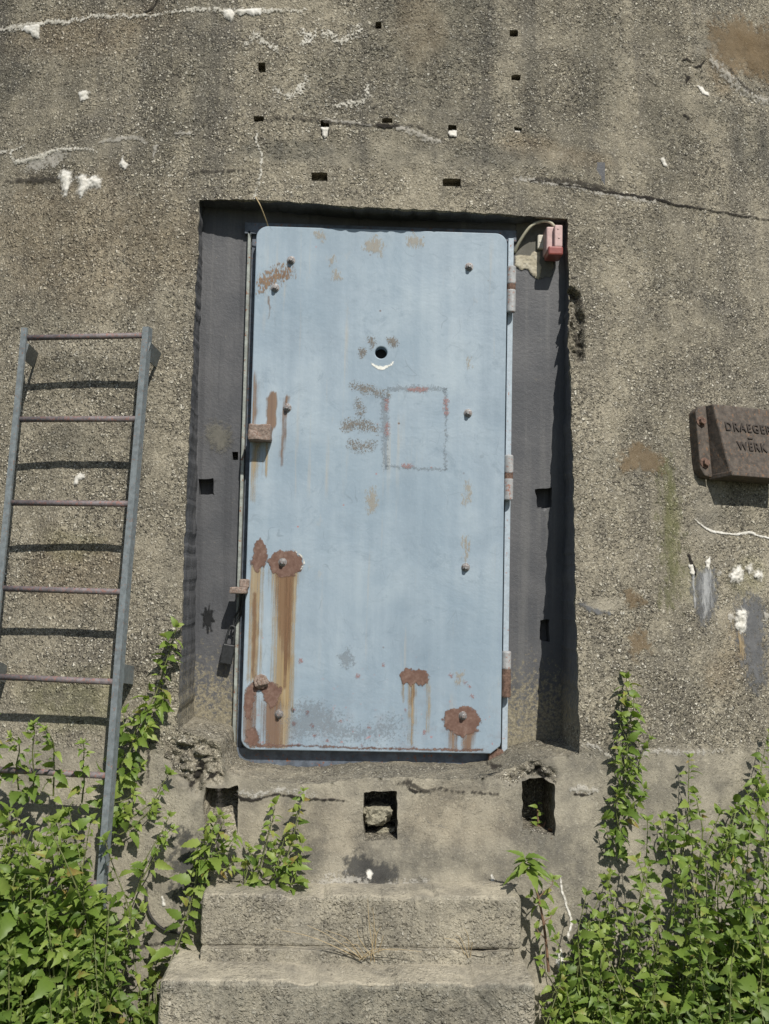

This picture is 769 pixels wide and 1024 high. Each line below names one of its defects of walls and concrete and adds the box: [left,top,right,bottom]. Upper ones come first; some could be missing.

crack [0,0,307,38]
leakage [58,169,102,196]
crack [514,176,769,220]
rust [256,262,296,294]
spalling [568,288,586,364]
rust [252,381,288,459]
rust [243,538,483,752]
leakage [687,553,769,694]
spalling [163,737,226,794]
crack [204,787,345,879]